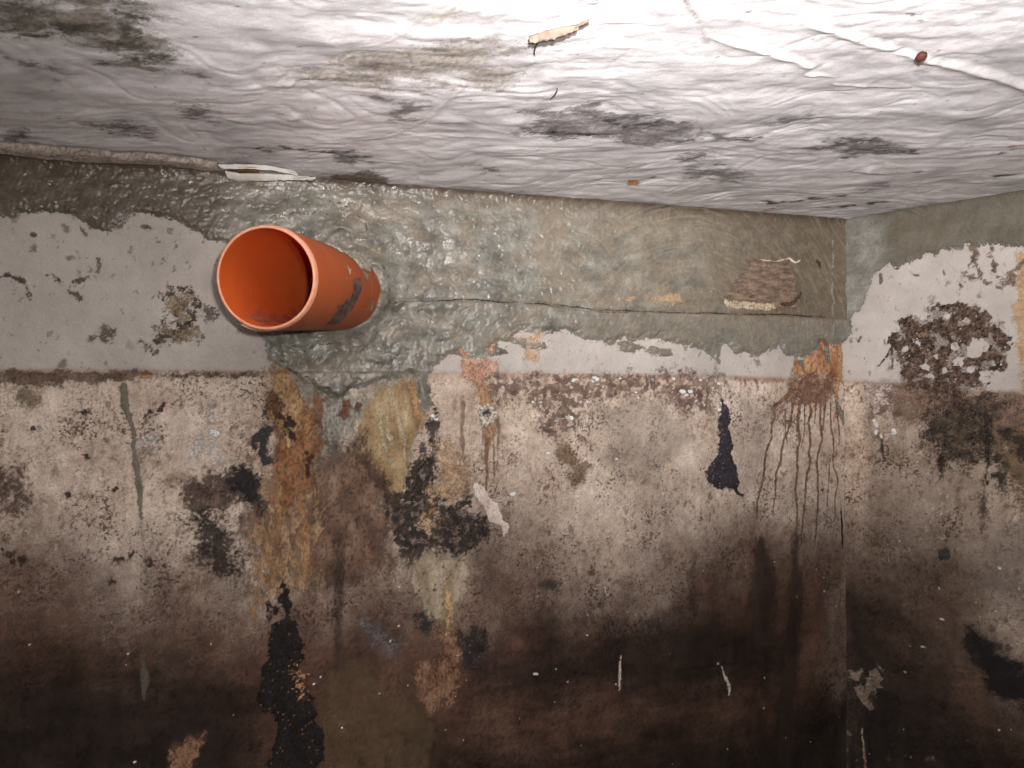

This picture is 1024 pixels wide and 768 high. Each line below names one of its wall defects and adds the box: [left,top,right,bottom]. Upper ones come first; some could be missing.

crack [271,200,368,231]
corrosion [238,363,405,627]
damp [0,368,1024,768]
crack [380,266,826,322]
corrosion [756,322,843,551]
spalling [878,301,1013,412]
damp [919,253,1024,531]
peeling [959,245,1024,289]